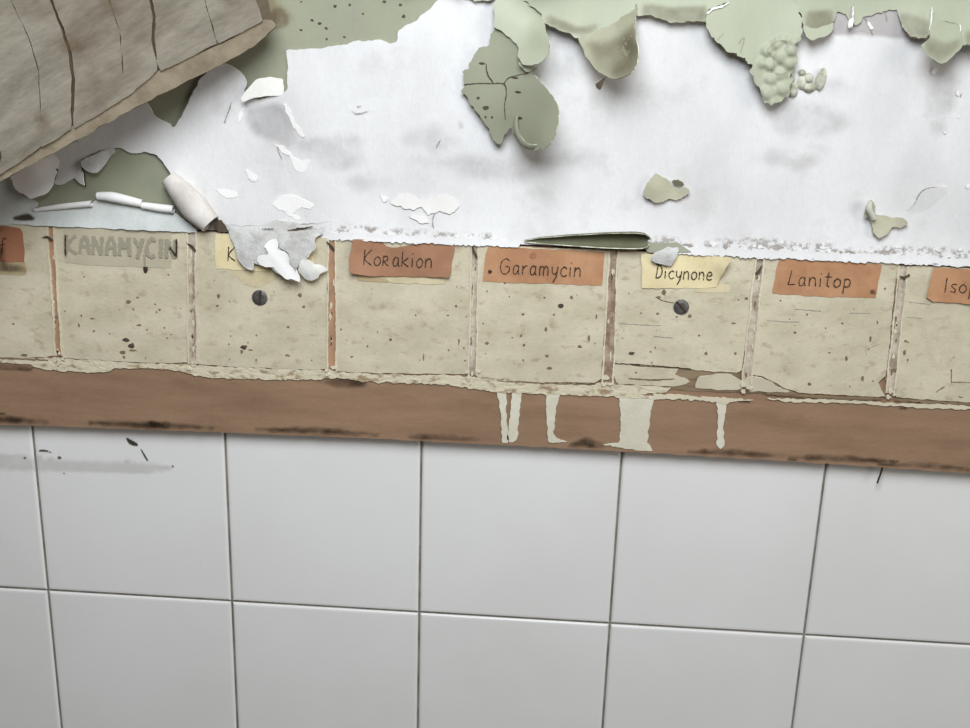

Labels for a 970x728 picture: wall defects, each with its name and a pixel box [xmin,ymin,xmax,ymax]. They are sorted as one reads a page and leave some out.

peeling [0,0,970,308]